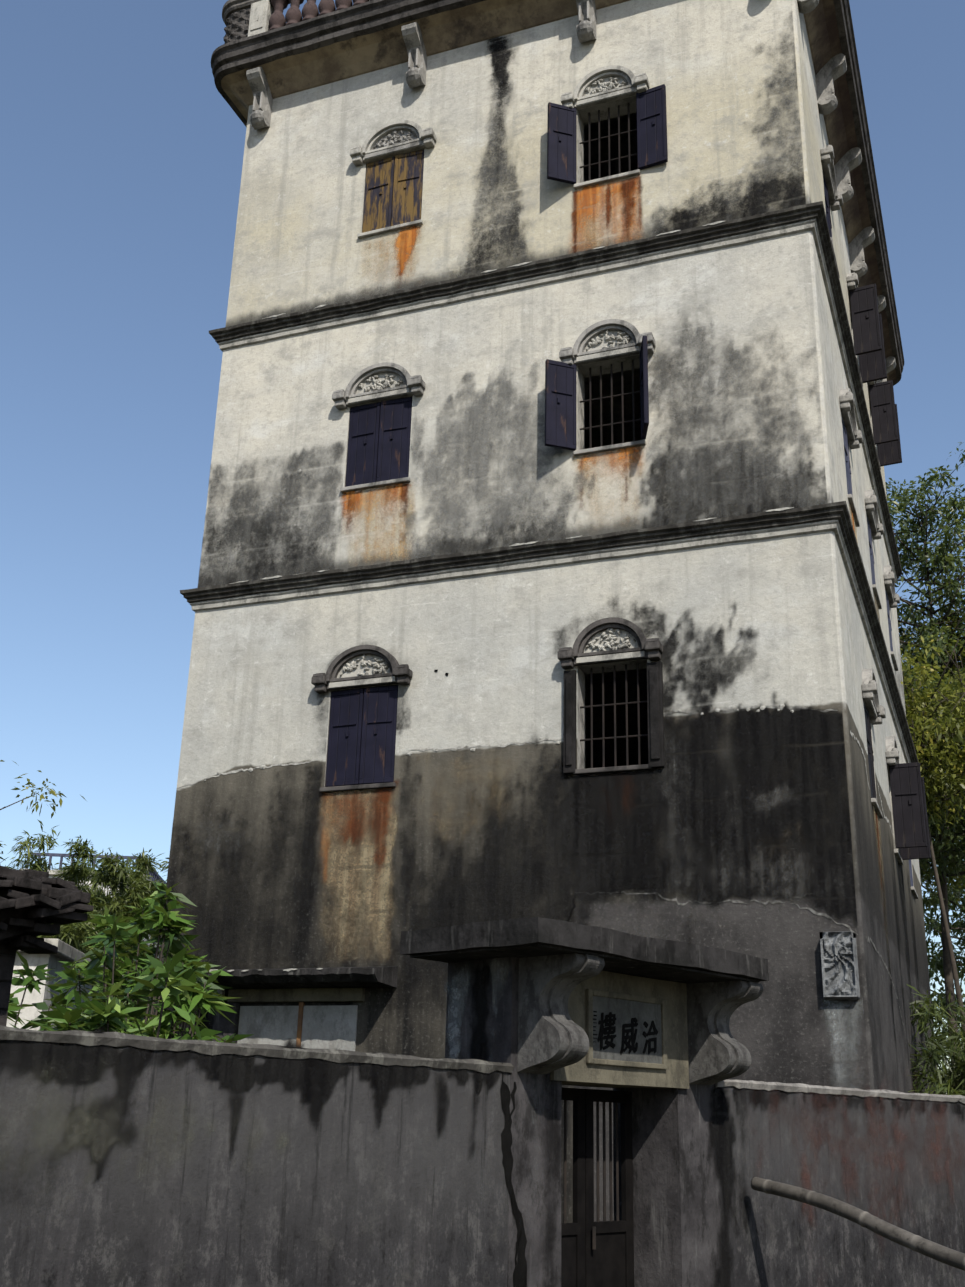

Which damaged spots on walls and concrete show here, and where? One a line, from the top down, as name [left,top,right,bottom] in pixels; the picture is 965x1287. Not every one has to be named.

corrosion [379,226,417,275]
damp [453,37,527,274]
corrosion [572,177,642,252]
damp [652,37,806,235]
damp [197,442,343,588]
corrosion [342,483,414,559]
corrosion [610,446,643,465]
damp [641,330,827,528]
damp [400,605,857,930]
corrosion [320,782,397,952]
damp [0,943,507,1179]
crack [500,1063,527,1287]